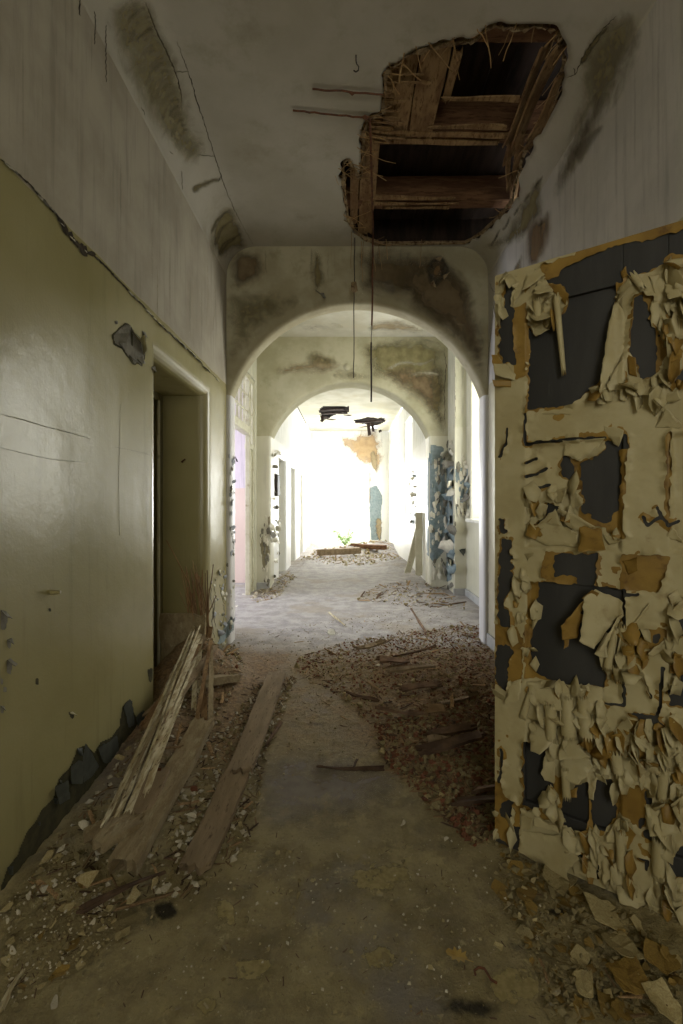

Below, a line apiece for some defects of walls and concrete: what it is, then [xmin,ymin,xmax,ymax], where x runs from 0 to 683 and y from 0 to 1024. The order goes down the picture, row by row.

leakage [116,4,198,157]
leakage [581,22,635,108]
peeling [1,159,219,381]
leakage [212,212,260,283]
leakage [494,180,540,241]
leakage [367,343,442,419]
peeling [589,266,670,398]
peeling [259,490,281,586]
peeling [409,440,471,589]
peeling [561,589,666,697]
peeling [1,699,145,891]
peeling [529,722,597,800]